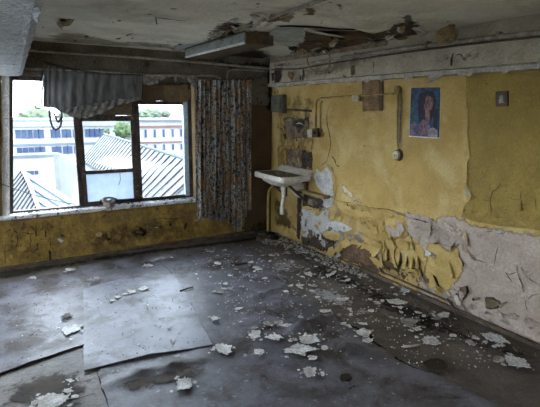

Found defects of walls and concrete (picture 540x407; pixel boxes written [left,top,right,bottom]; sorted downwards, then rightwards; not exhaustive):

peeling [280,58,540,344]
crack [506,265,537,310]
peeling [415,333,449,346]
peeling [477,332,511,348]